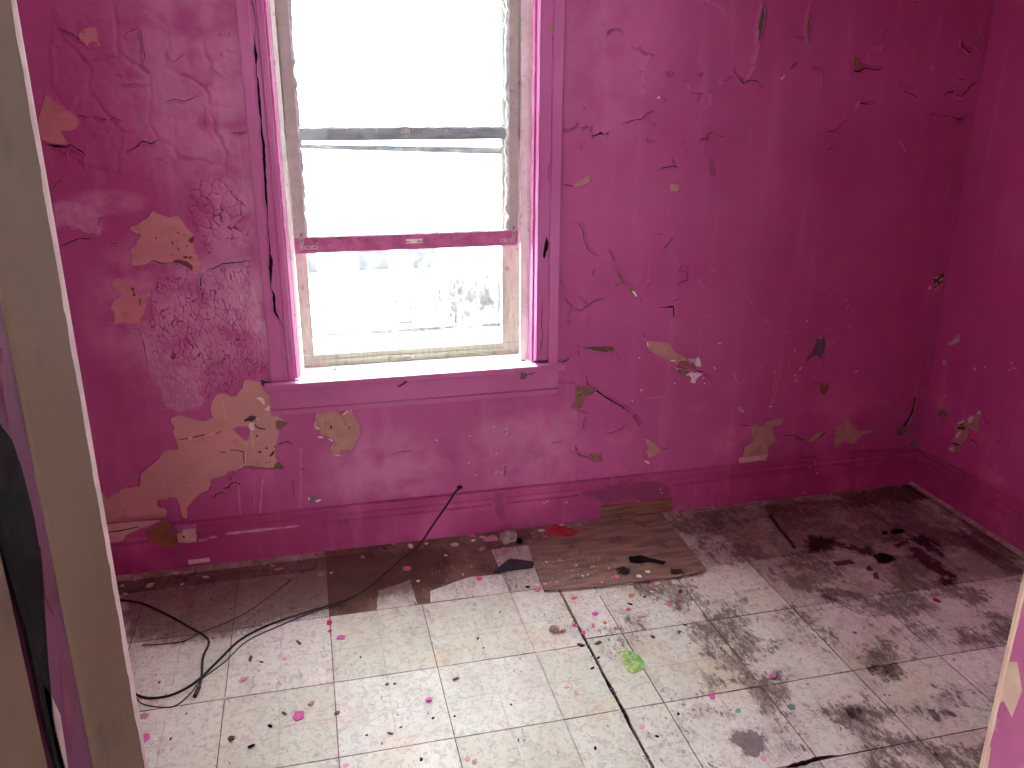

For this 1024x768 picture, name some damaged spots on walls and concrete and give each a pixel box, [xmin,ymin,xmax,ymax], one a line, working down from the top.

crack [56,0,289,380]
peeling [642,331,704,383]
peeling [11,0,290,768]
peeling [569,385,596,411]
peeling [313,410,361,456]
peeling [737,415,784,463]
peeling [938,408,984,453]
damp [768,515,957,587]